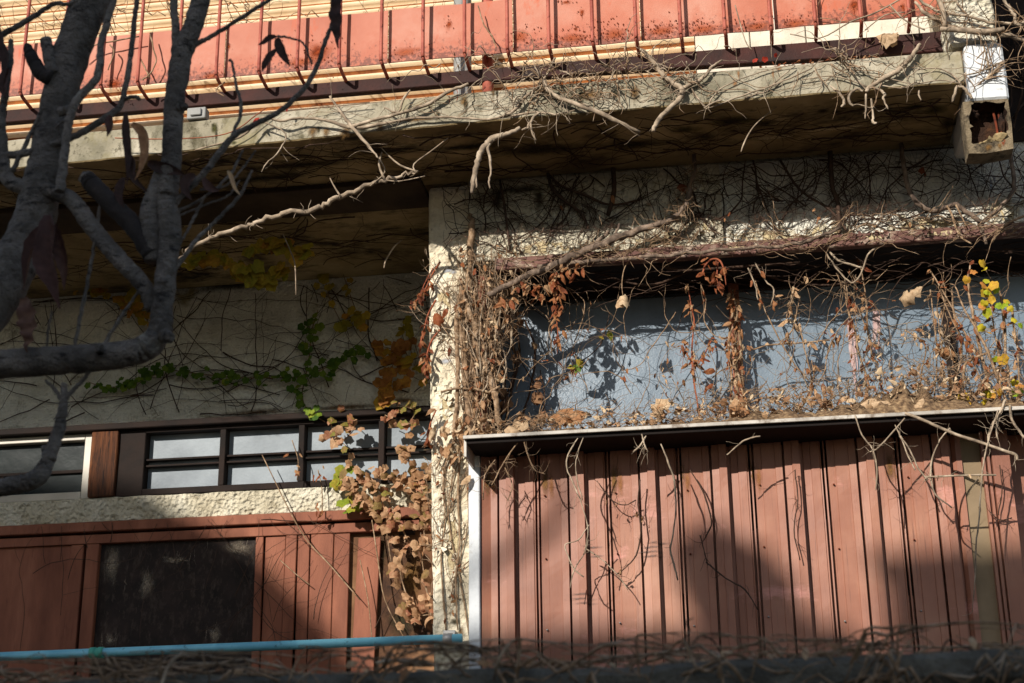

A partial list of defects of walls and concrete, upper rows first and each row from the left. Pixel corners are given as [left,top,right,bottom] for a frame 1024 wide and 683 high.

rust [510,0,824,49]
spalling [969,109,1008,144]